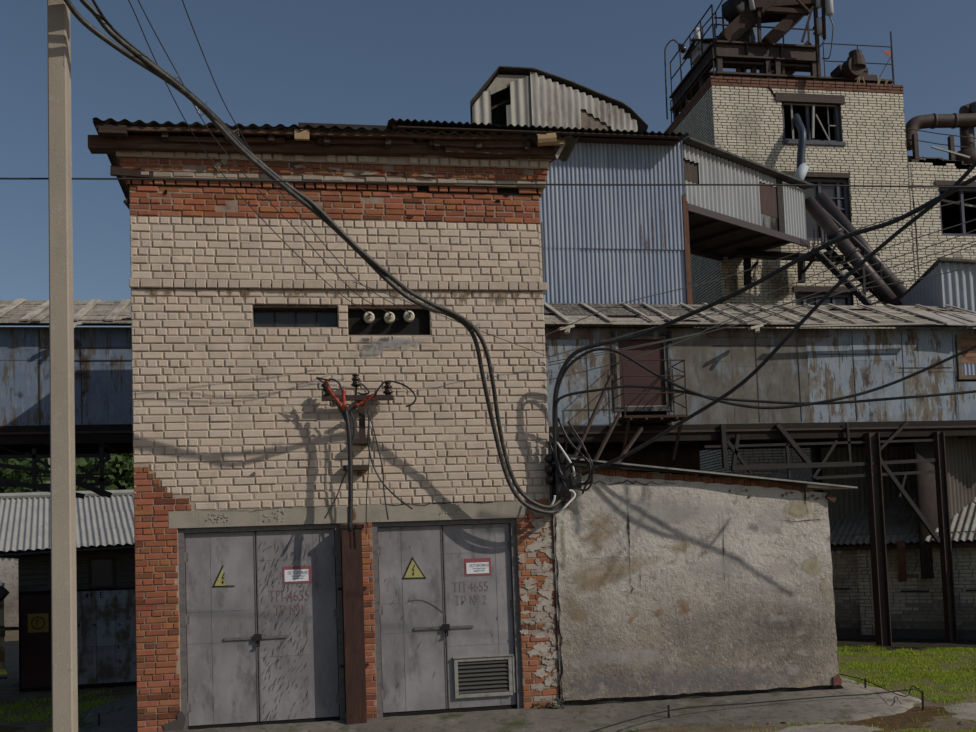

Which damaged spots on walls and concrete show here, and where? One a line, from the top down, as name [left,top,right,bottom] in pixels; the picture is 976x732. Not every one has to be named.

crack [384,498,496,506]
crack [582,479,674,593]
crack [784,487,826,522]
peeling [518,518,560,692]
crack [554,514,830,701]